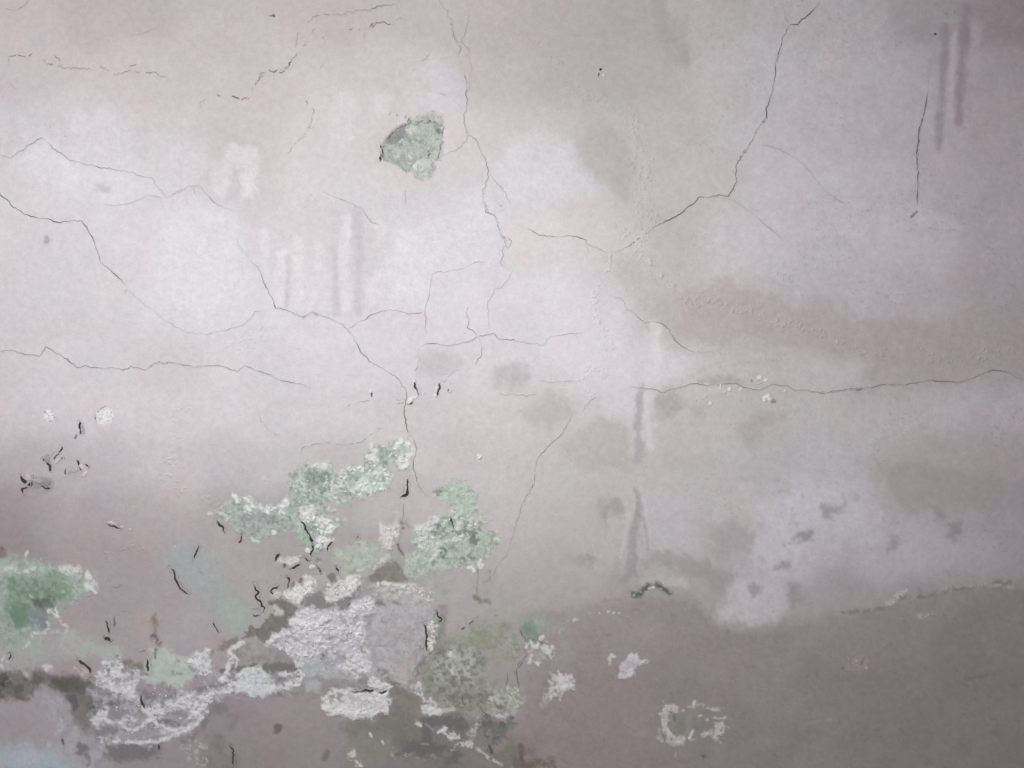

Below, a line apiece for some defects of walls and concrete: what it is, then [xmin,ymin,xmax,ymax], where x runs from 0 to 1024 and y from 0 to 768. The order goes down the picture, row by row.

water stain [931,0,984,155]
spalling [368,109,446,189]
crack [0,0,1024,577]
peeling [17,405,115,501]
water stain [0,249,1024,768]
peeling [268,541,341,599]
spalling [361,593,440,695]